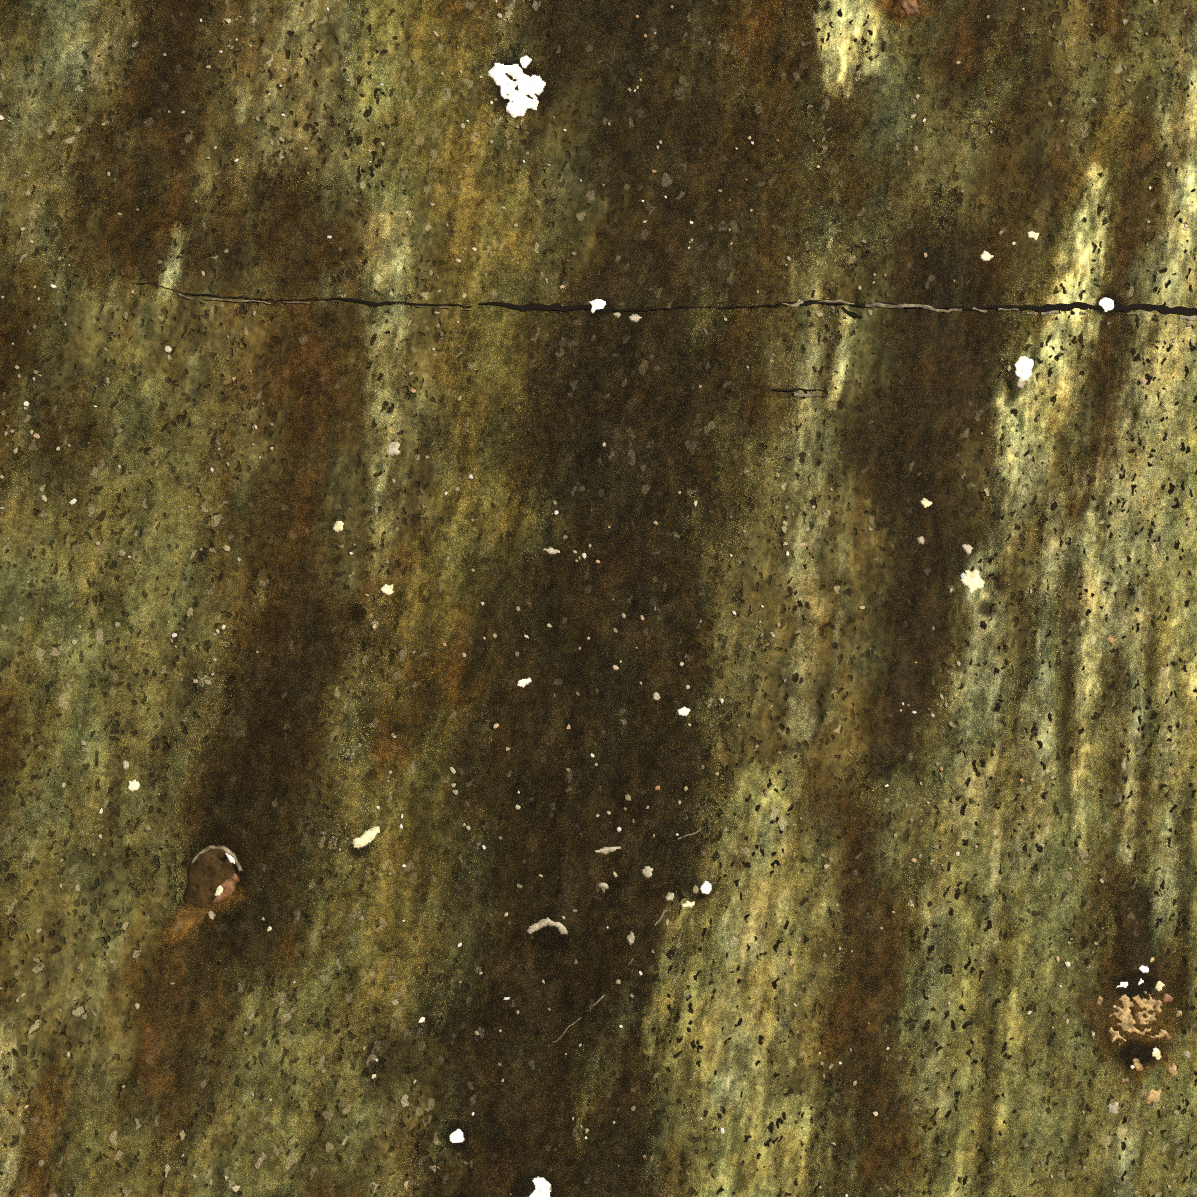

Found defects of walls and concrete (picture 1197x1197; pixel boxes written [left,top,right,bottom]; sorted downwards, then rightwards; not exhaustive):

damp [68,0,349,284]
damp [817,0,881,147]
rust [875,0,928,21]
damp [930,0,1027,91]
crack [135,282,1197,321]
damp [115,0,814,1197]
damp [841,65,1197,1197]
damp [816,788,915,1197]